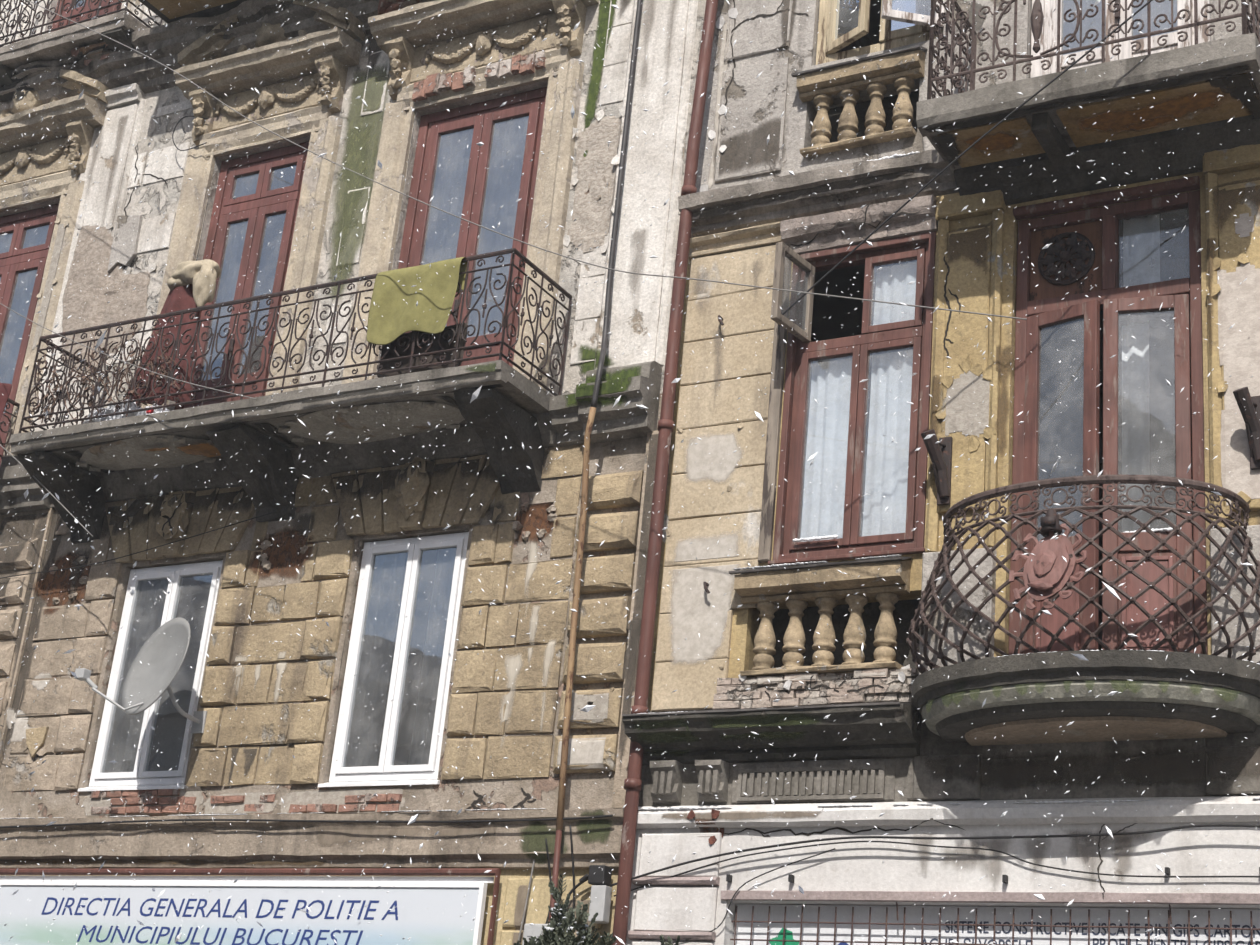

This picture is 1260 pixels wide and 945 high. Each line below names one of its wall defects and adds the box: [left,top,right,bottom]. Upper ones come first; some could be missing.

crack [724,0,808,117]
crack [943,256,961,356]
flaking render [936,356,996,453]
flaking render [1205,213,1260,518]
peeling [665,528,753,669]
flaking render [738,664,910,690]
flaking render [83,786,405,816]